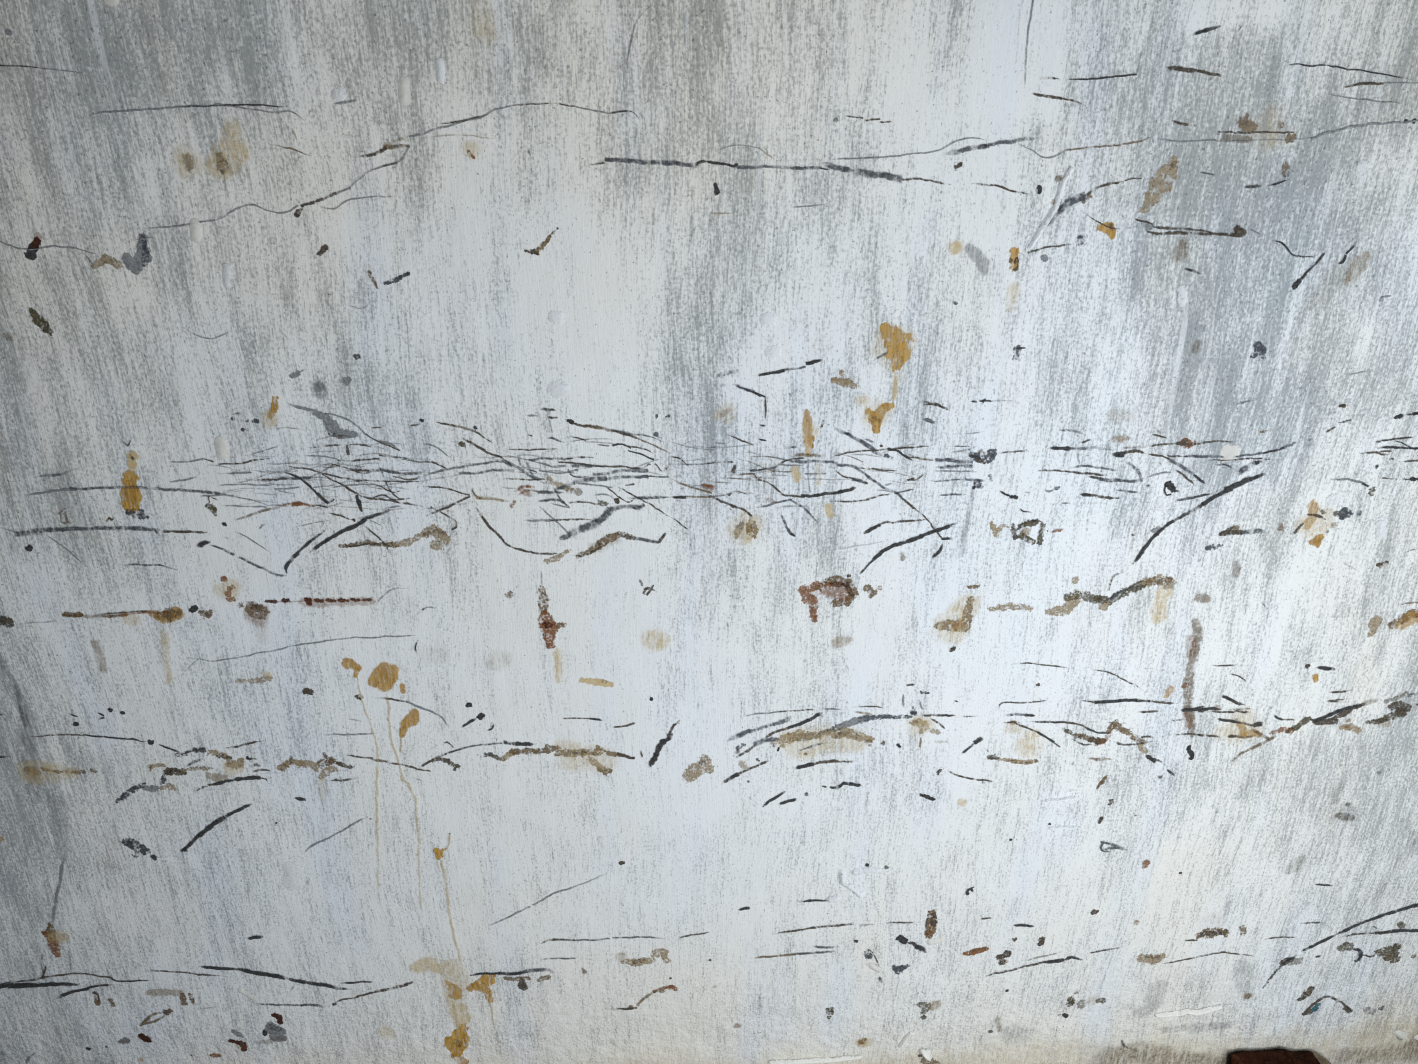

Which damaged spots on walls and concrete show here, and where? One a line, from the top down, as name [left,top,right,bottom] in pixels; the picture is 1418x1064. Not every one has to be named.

crack [138,64,1418,262]
crack [1136,219,1355,290]
corrosion [865,390,898,434]
corrosion [106,440,149,522]
corrosion [537,572,566,679]
corrosion [798,575,882,623]
corrosion [342,658,406,700]
crack [1178,665,1294,760]
crack [180,756,306,852]
crack [724,758,862,807]
crack [0,936,413,1007]
corrosion [415,959,496,1064]